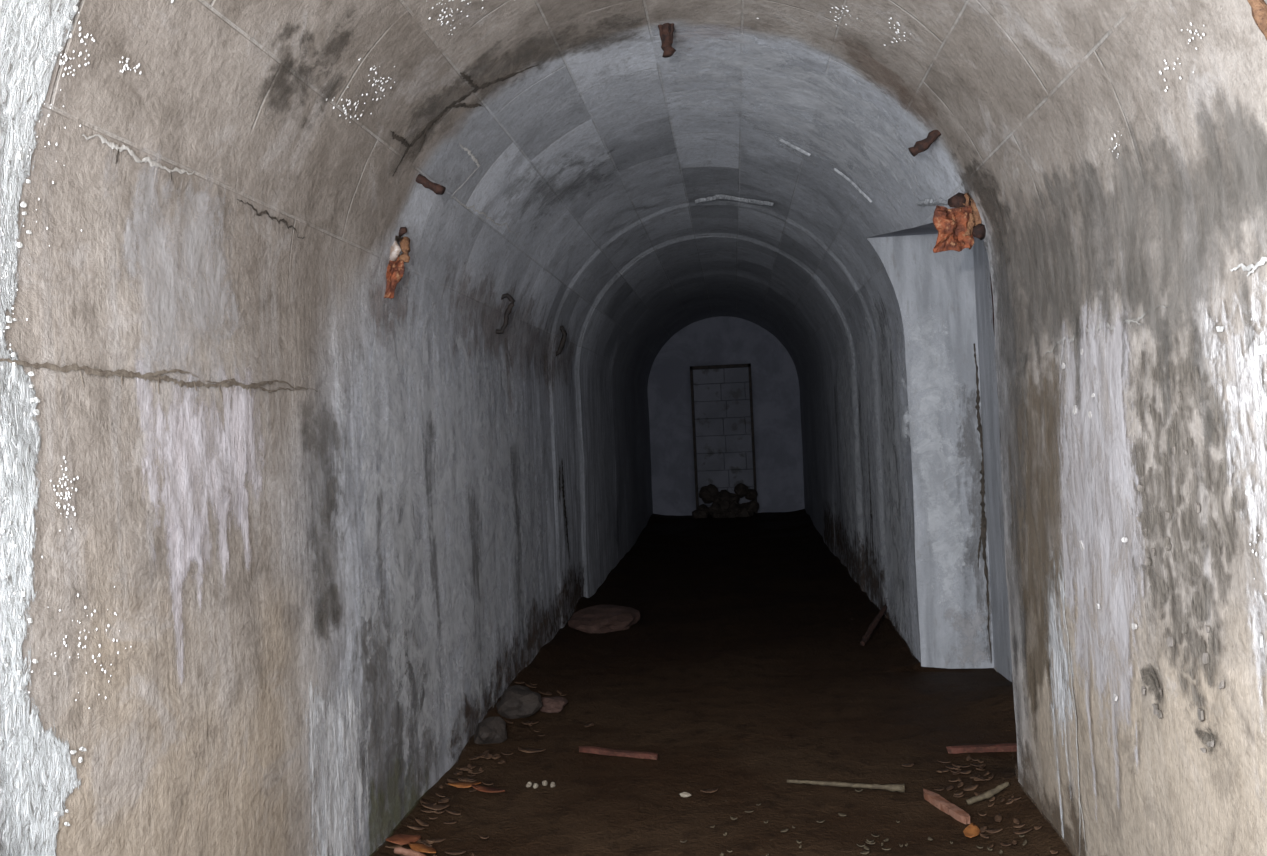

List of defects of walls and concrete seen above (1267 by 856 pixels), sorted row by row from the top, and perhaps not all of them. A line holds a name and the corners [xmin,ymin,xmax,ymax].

damp [325,32,351,56]
damp [263,53,313,108]
crack [82,134,194,181]
crack [237,199,304,239]
crack [0,358,318,401]
damp [124,166,264,683]
damp [959,106,1267,838]
damp [302,303,542,856]